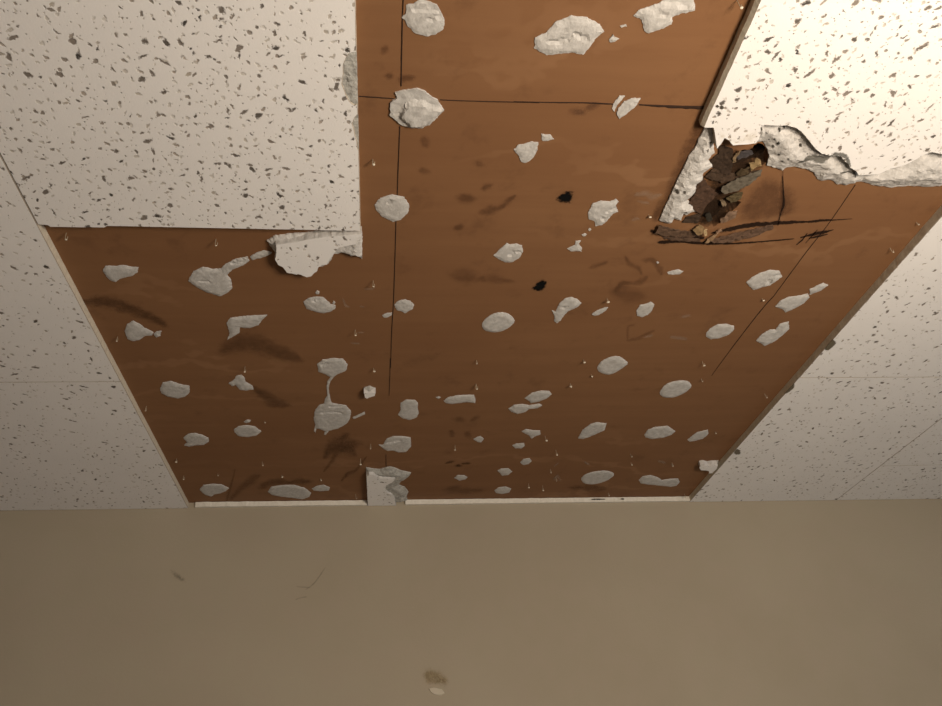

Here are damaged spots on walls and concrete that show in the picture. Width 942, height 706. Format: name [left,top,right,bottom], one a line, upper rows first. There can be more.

spalling [342,52,359,149]
peeling [655,145,774,243]
peeling [250,250,272,260]
crack [650,177,855,376]
peeling [809,283,828,295]